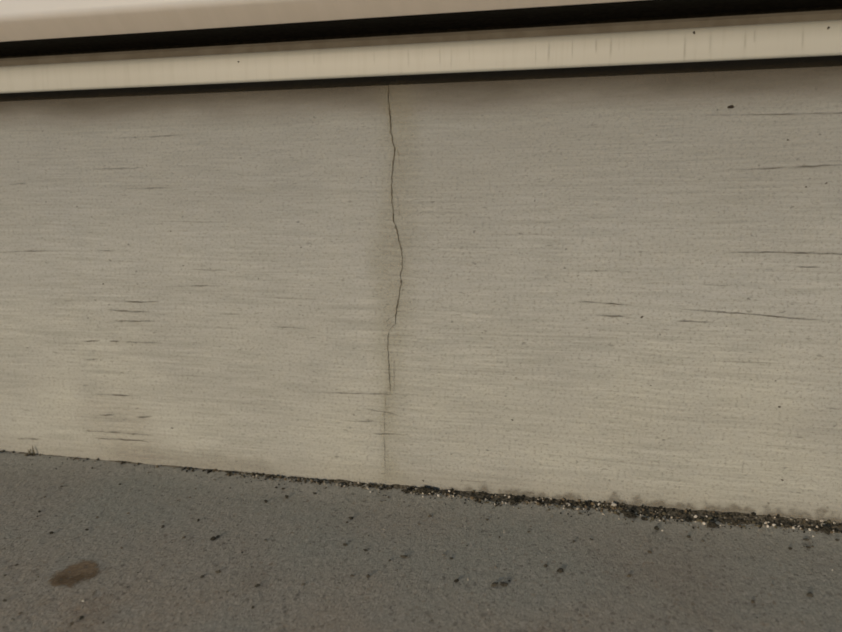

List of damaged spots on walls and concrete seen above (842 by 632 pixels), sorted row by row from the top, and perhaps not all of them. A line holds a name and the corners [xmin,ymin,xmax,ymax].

crack [384,83,403,459]